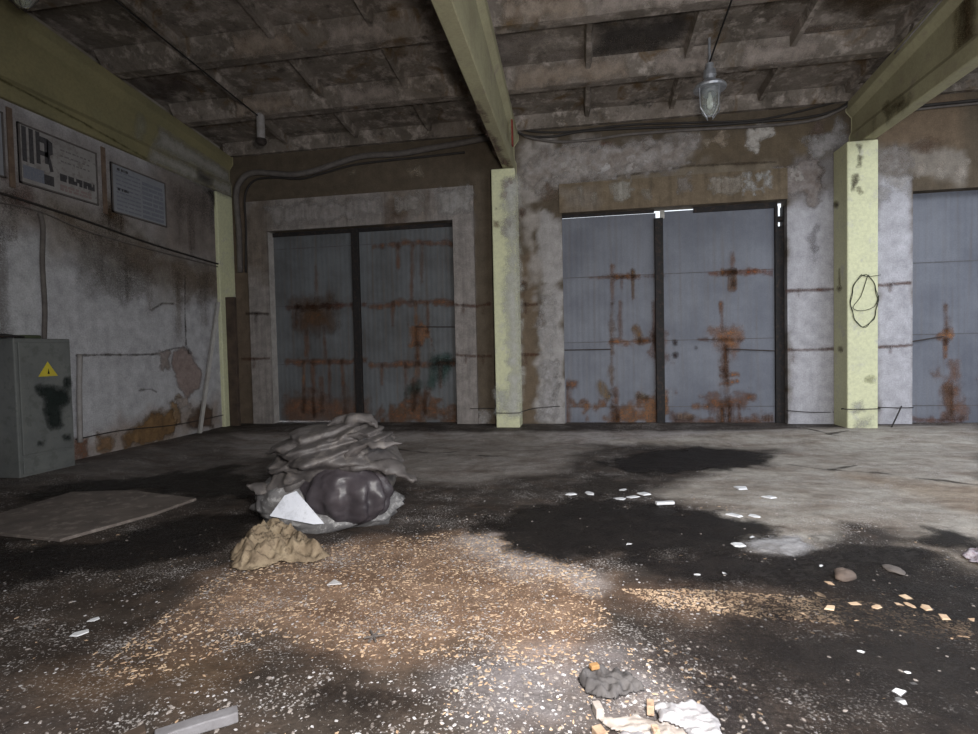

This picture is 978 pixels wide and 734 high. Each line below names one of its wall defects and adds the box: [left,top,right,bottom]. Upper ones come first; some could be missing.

rust [611,265,639,298]
rust [710,258,764,291]
flaking render [74,347,214,460]
rust [285,267,491,422]
rust [609,304,677,358]
rust [566,369,770,422]
rust [702,302,742,386]
rust [912,305,966,423]